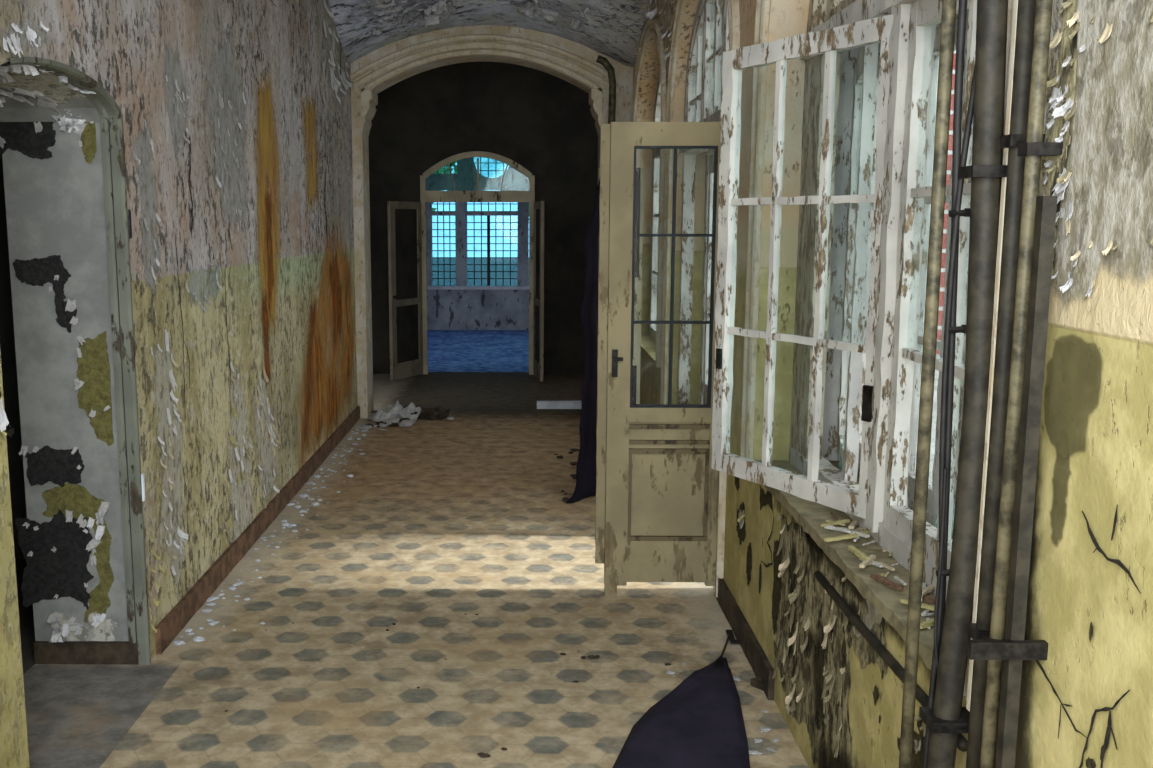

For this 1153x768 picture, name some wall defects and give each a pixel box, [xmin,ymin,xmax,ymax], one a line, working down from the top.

rust [257,84,279,384]
peeling [323,0,461,120]
peeling [637,0,677,94]
peeling [1041,0,1153,312]
peeling [0,387,9,436]
flaking render [13,255,114,446]
flaking render [15,445,117,643]
rust [301,242,354,461]
flaking render [735,477,888,768]
damp [1024,335,1101,640]
crack [1036,660,1130,768]
crack [1082,505,1141,594]